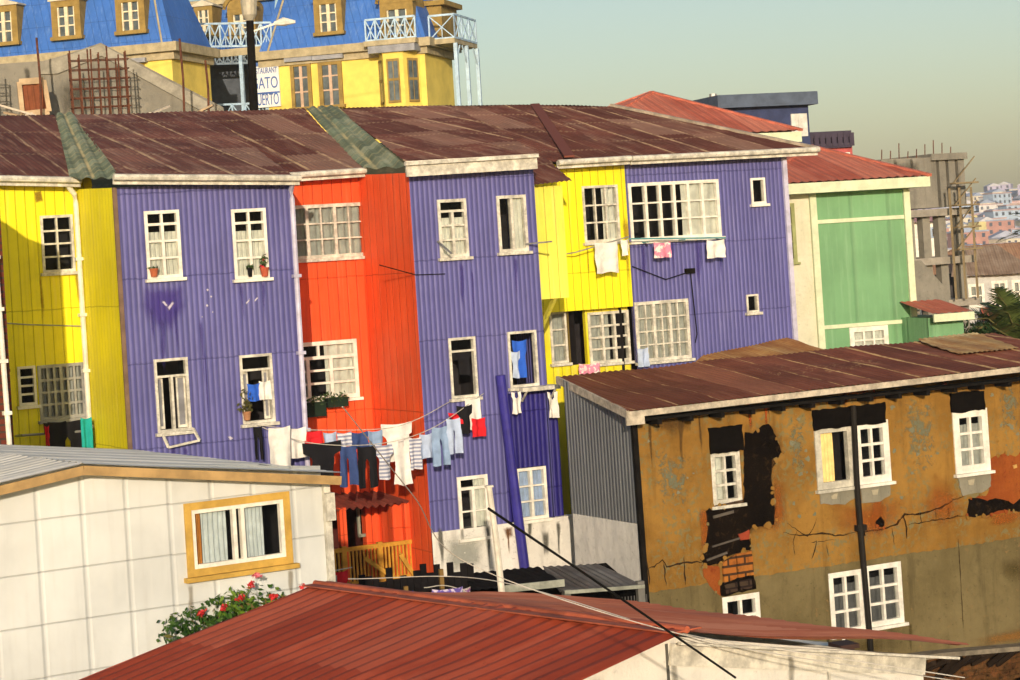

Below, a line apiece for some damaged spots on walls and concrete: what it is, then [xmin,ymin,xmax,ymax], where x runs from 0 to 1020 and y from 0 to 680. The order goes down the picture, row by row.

peeling [655,450,696,513]
flaking render [699,413,811,596]
crack [783,496,965,621]
flaking render [966,440,1020,520]